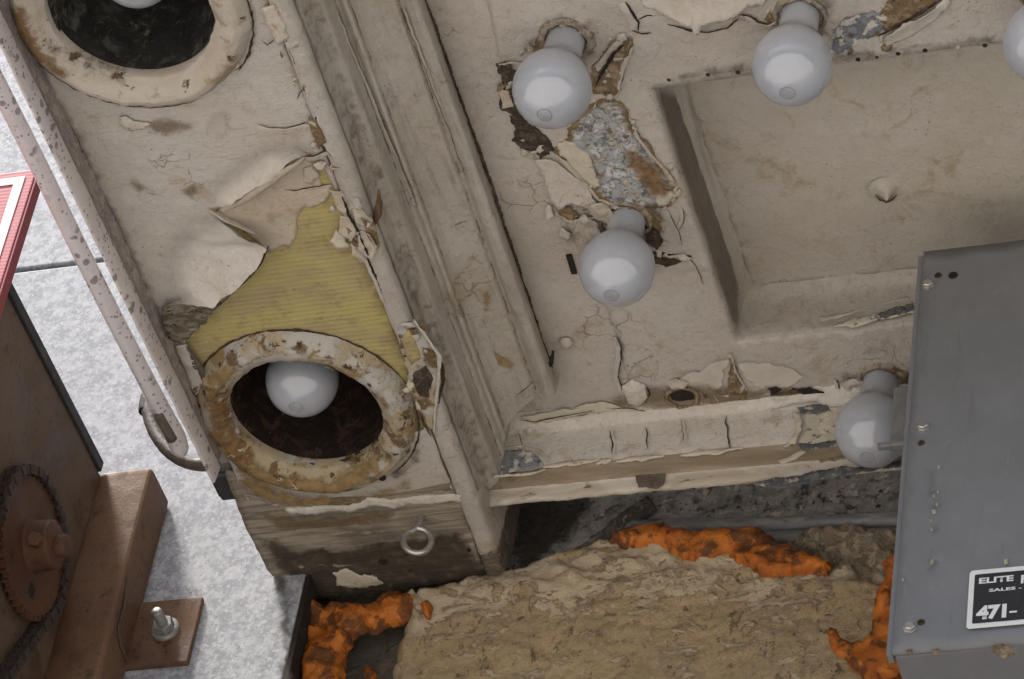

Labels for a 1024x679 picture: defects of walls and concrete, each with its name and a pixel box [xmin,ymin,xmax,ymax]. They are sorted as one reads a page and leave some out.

spalling [822,0,951,56]
peeling [497,81,514,115]
spalling [520,33,692,272]
crack [664,208,685,246]
peeling [161,142,380,409]
peeling [820,296,915,327]
peeling [397,319,446,436]
corrosion [203,392,254,470]
spalling [494,444,551,478]
crack [709,391,730,448]
peeling [668,359,902,489]
damp [265,534,477,598]